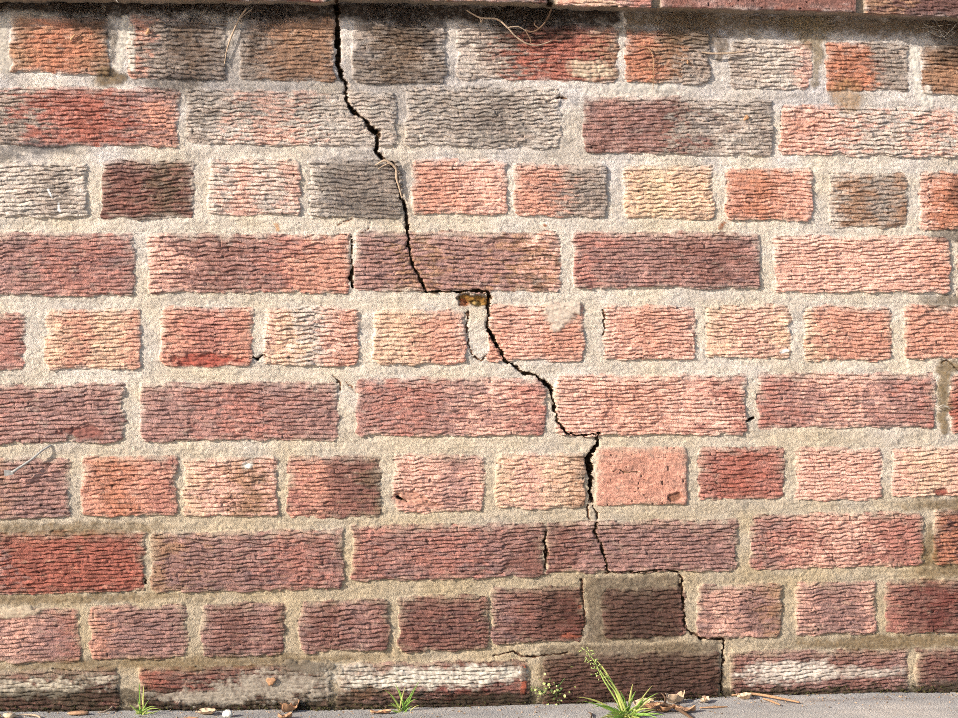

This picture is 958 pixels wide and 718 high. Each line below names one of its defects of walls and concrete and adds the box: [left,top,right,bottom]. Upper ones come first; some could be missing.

leakage [0,659,533,707]
crack [333,0,725,696]